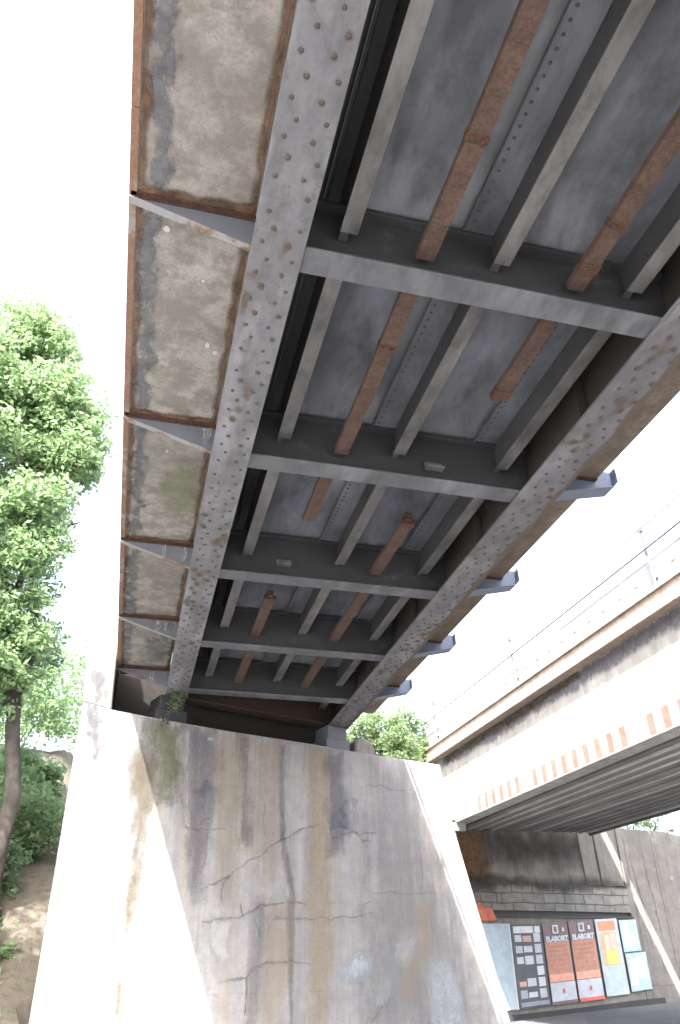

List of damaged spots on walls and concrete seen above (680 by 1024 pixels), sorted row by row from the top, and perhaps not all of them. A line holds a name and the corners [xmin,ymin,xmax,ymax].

damp [150,0,179,188]
corrosion [138,0,295,215]
corrosion [415,0,550,262]
corrosion [565,106,680,292]
damp [132,211,162,410]
corrosion [334,292,419,455]
corrosion [490,318,558,402]
corrosion [302,477,333,521]
corrosion [369,512,415,576]
damp [185,728,216,889]
damp [482,830,581,865]